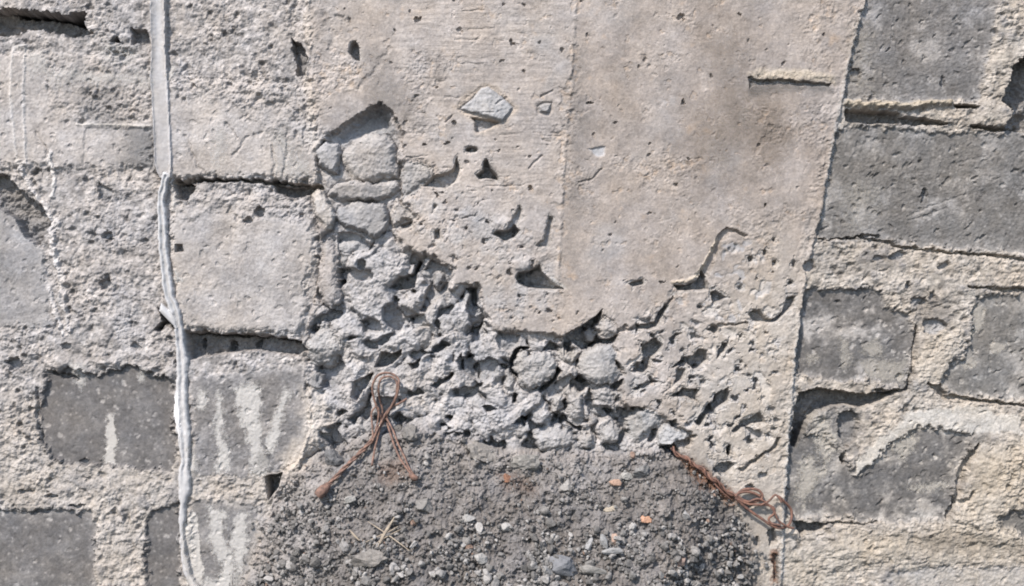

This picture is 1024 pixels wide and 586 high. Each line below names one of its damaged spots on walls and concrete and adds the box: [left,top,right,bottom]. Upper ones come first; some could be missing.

spalling [455,85,519,134]
crack [150,0,325,577]
spalling [298,102,797,480]
corrosion [680,458,737,503]
crack [792,520,880,539]